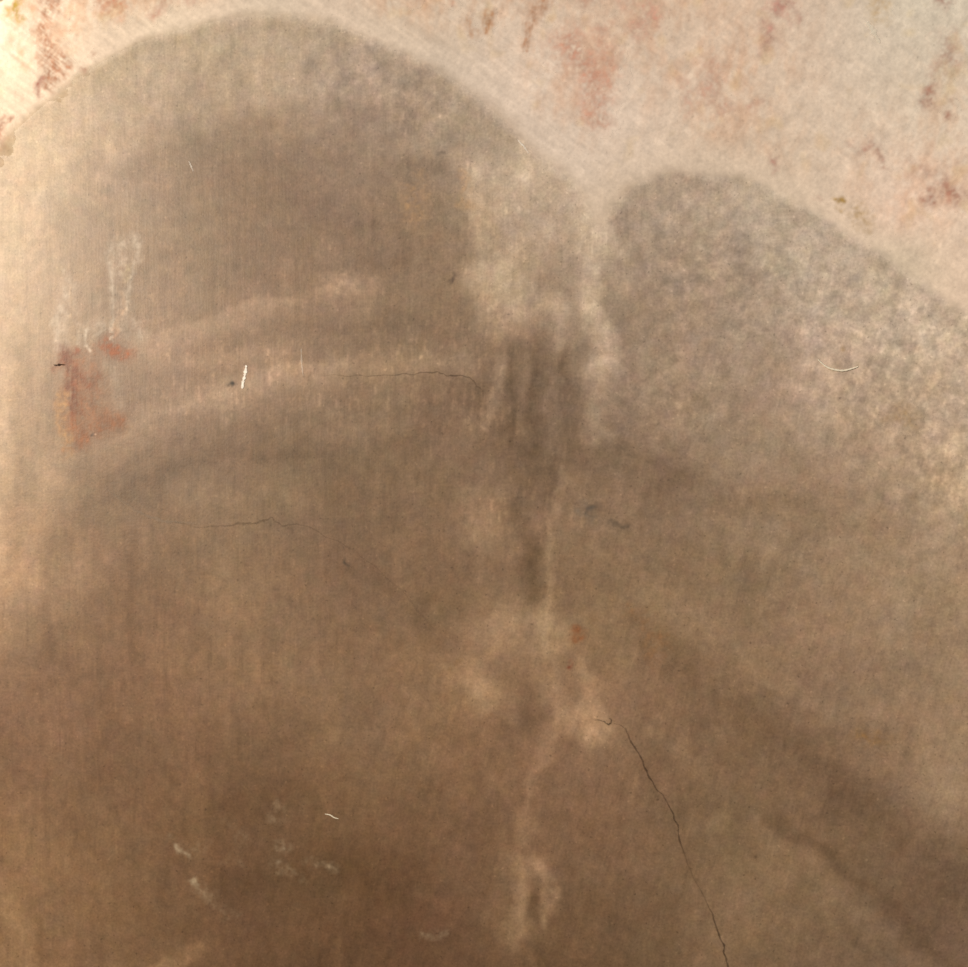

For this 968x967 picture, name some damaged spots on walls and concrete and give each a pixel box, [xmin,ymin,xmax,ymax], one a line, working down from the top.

crack [516,0,557,57]
corrosion [44,327,142,464]